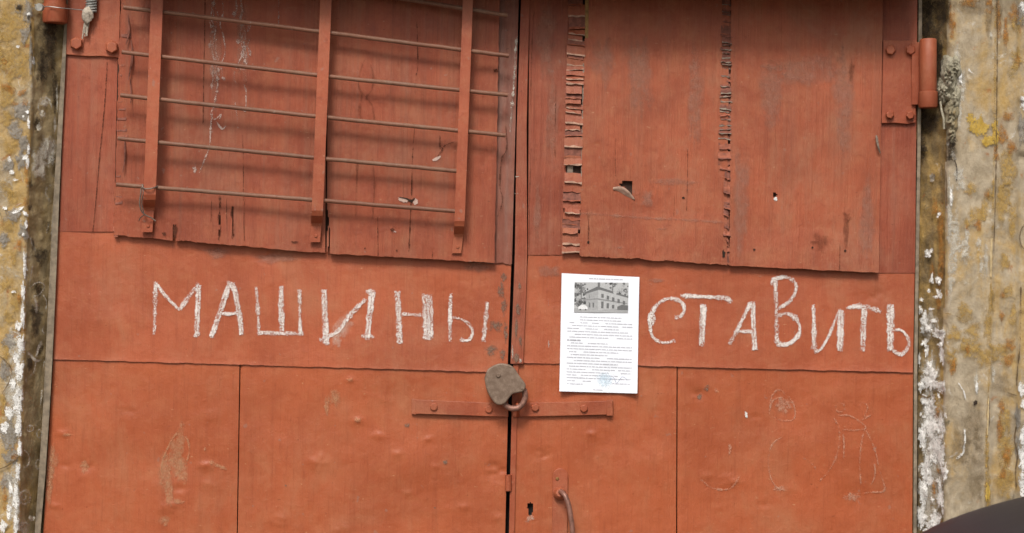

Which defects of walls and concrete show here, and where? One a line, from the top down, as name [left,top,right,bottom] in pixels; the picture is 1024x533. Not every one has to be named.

damp [29,19,59,199]
crack [211,141,245,241]
damp [916,110,940,197]
damp [917,0,960,82]
efflorescence [946,170,988,293]
damp [27,238,48,376]
peeling [0,253,28,533]
peeling [917,272,948,531]